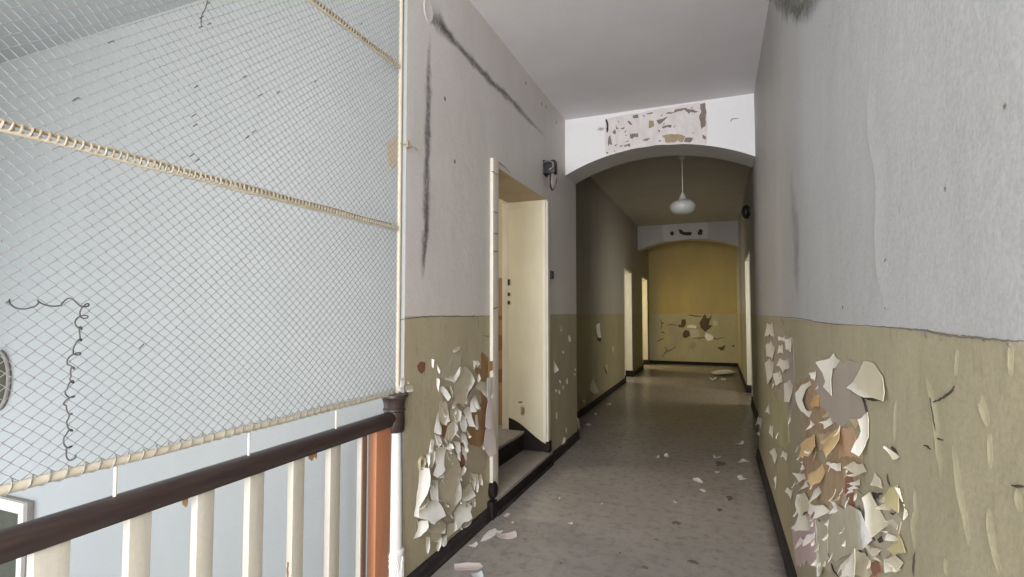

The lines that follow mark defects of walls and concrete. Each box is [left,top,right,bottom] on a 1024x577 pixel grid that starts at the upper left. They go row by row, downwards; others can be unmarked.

water stain [443,26,518,108]
peeling [605,102,707,155]
peeling [553,326,576,394]
peeling [668,315,734,351]
peeling [414,335,502,553]
peeling [755,320,908,577]